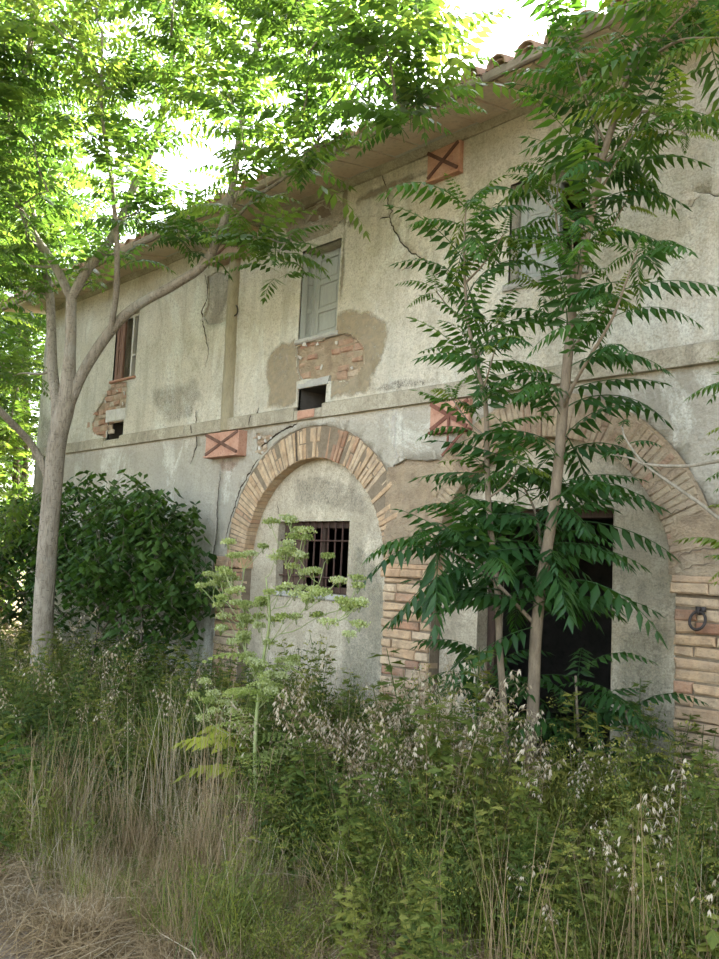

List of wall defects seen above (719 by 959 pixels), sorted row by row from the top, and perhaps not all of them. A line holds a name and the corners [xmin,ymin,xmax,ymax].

crack [201,276,209,366]
spalling [298,334,365,381]
spalling [87,382,127,437]